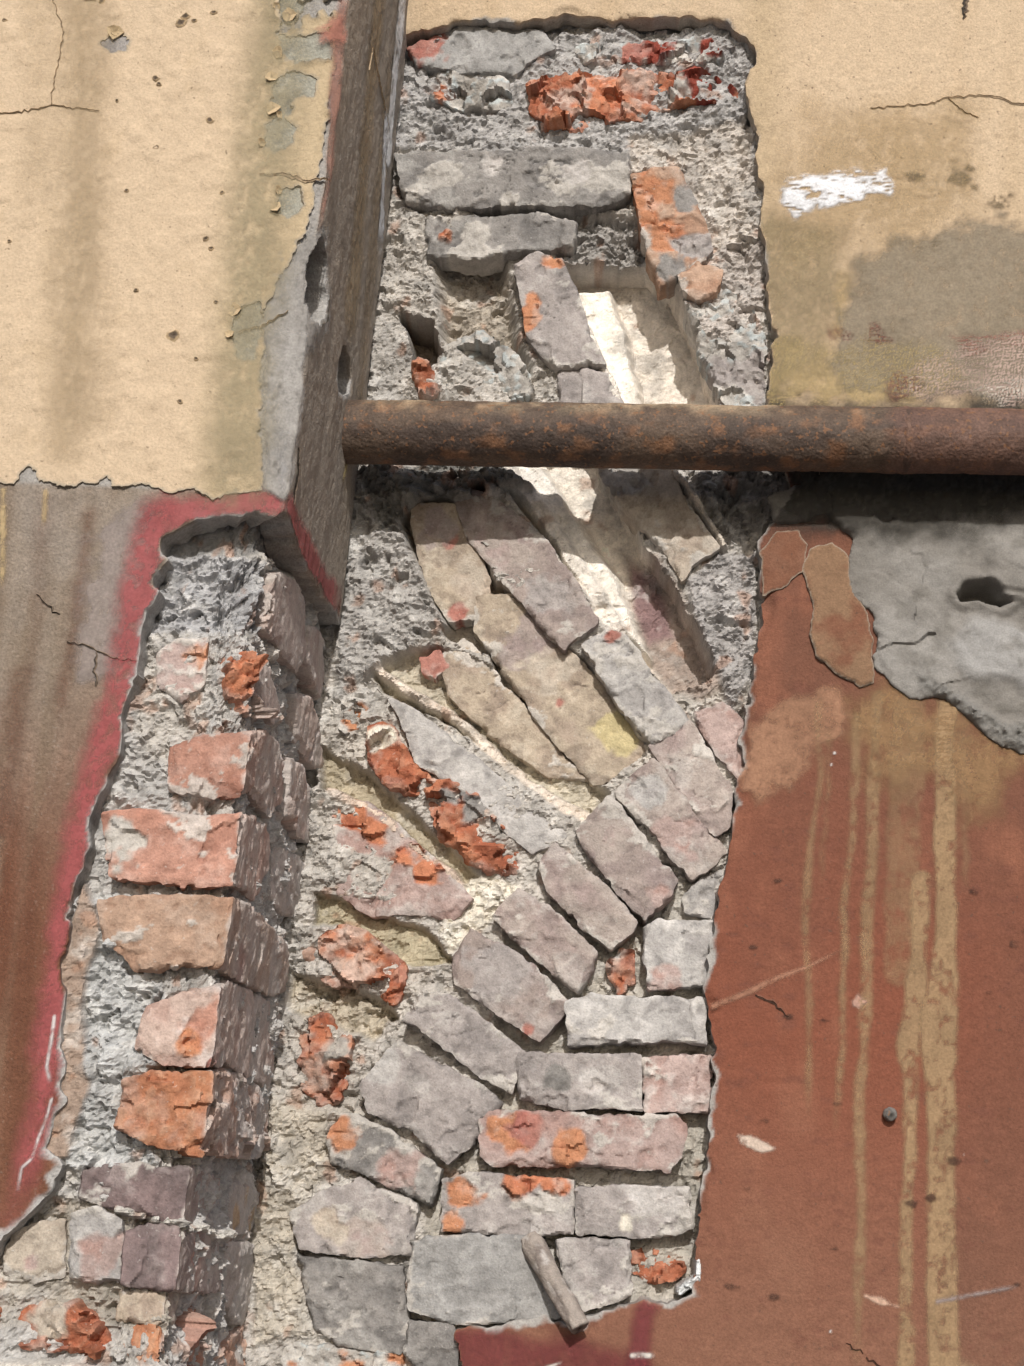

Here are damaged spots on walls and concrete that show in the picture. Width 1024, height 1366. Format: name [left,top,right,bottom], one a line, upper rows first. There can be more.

crack [0,0,99,114]
peeling [101,25,129,53]
spalling [173,3,217,27]
peeling [258,0,347,212]
crack [870,94,1024,118]
spalling [166,329,180,342]
peeling [213,229,332,499]
peeling [270,185,303,219]
spalling [366,24,775,406]
water stain [762,213,1024,401]
spalling [0,464,875,1366]
water stain [853,690,1024,1366]